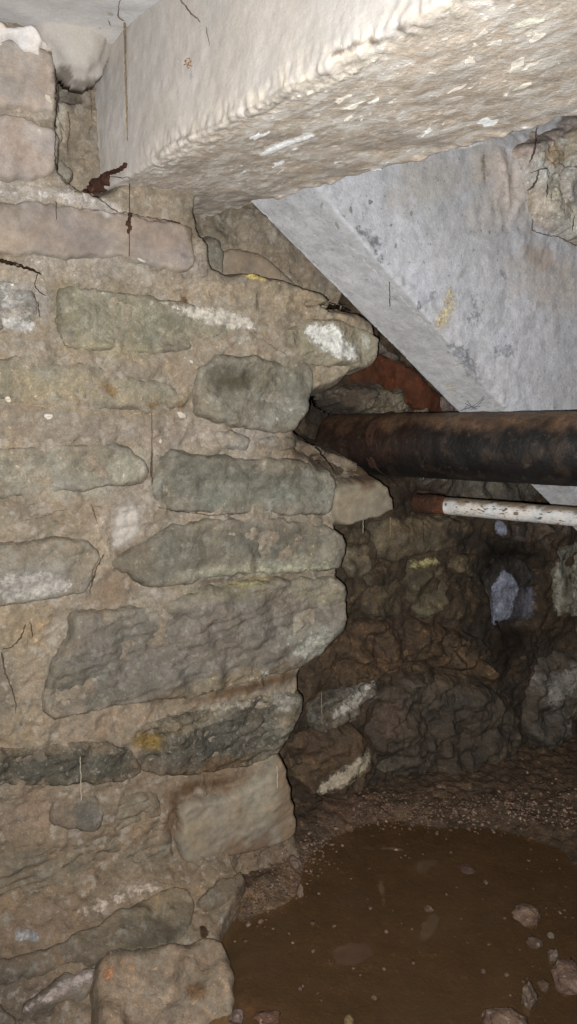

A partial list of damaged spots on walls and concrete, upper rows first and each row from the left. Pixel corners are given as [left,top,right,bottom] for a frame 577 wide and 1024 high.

corrosion [82,162,127,194]
crack [54,69,180,224]
crack [527,127,552,202]
crack [532,216,576,246]
crack [0,258,46,317]